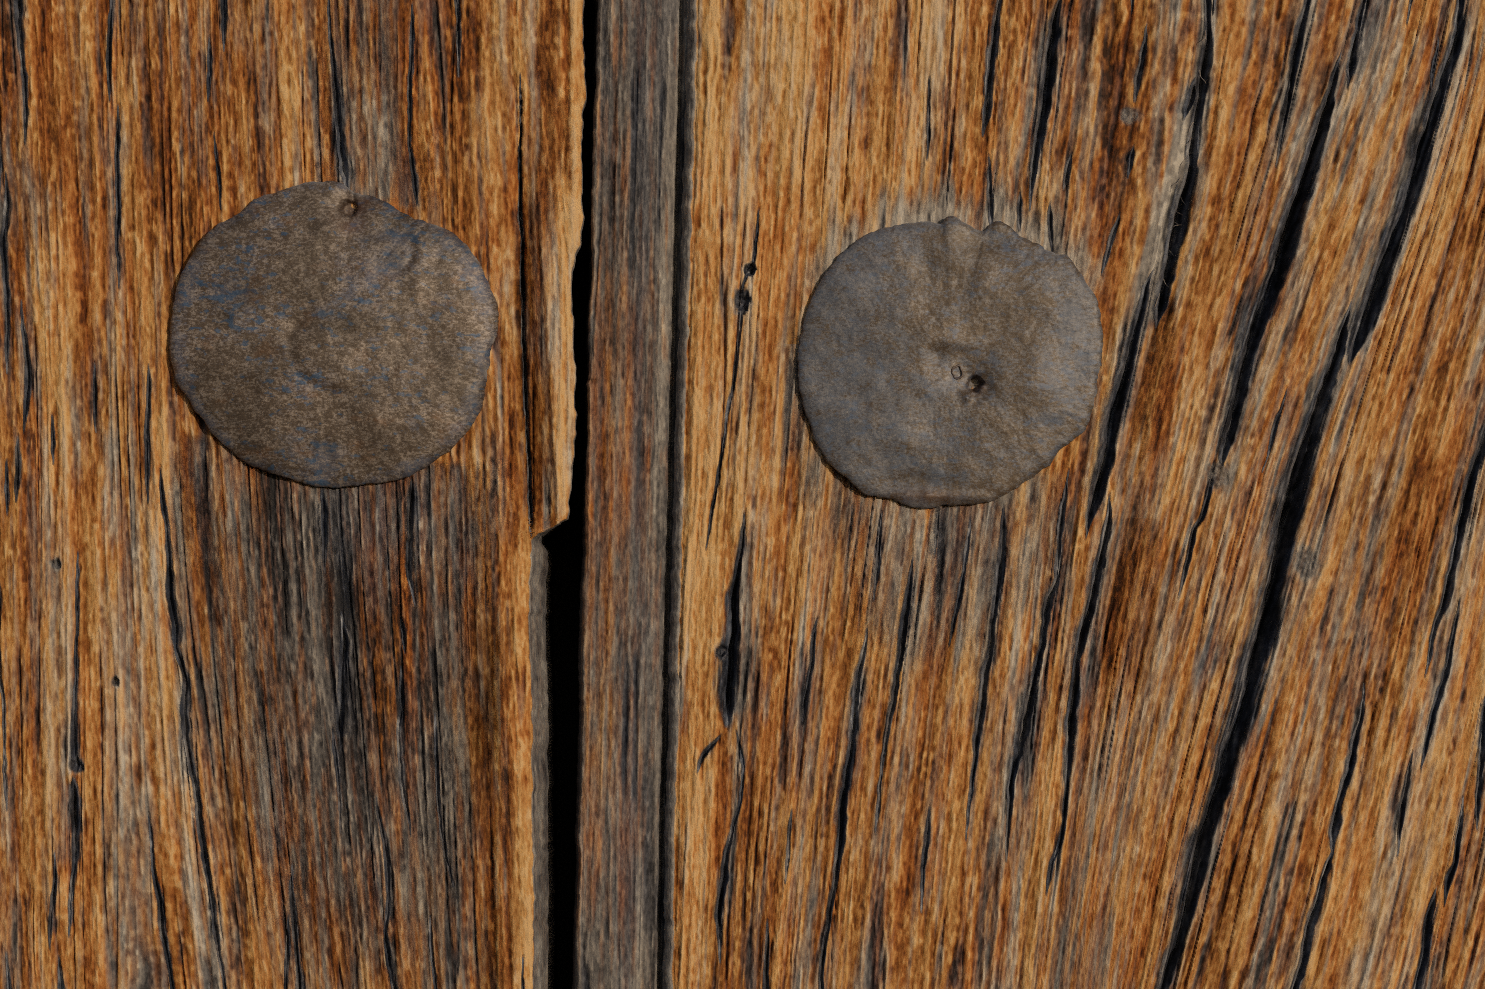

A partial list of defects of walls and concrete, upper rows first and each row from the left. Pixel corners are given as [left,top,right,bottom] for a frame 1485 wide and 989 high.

crack [518,74,533,536]
crack [697,210,759,963]
crack [761,921,769,989]
crack [784,810,792,883]
crack [802,619,818,723]
crack [819,0,1217,989]